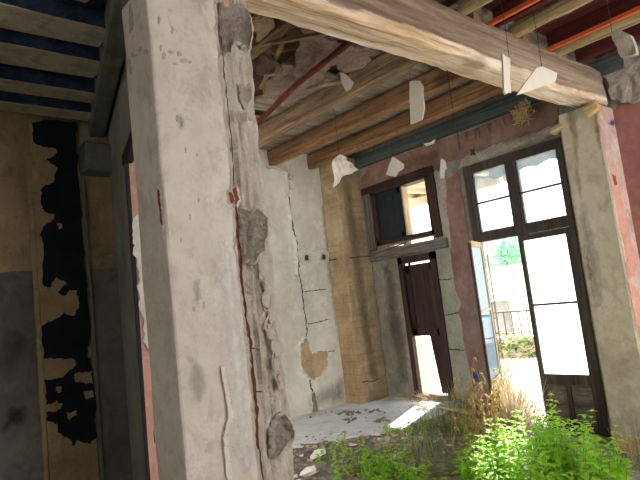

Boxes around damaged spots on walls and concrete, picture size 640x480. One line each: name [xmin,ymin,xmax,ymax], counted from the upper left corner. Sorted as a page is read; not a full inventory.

flaking render [217,0,254,57]
peeling [31,120,97,446]
flaking render [226,183,285,398]
flaking render [268,410,296,459]
crack [282,172,328,340]
flaking render [298,336,329,381]